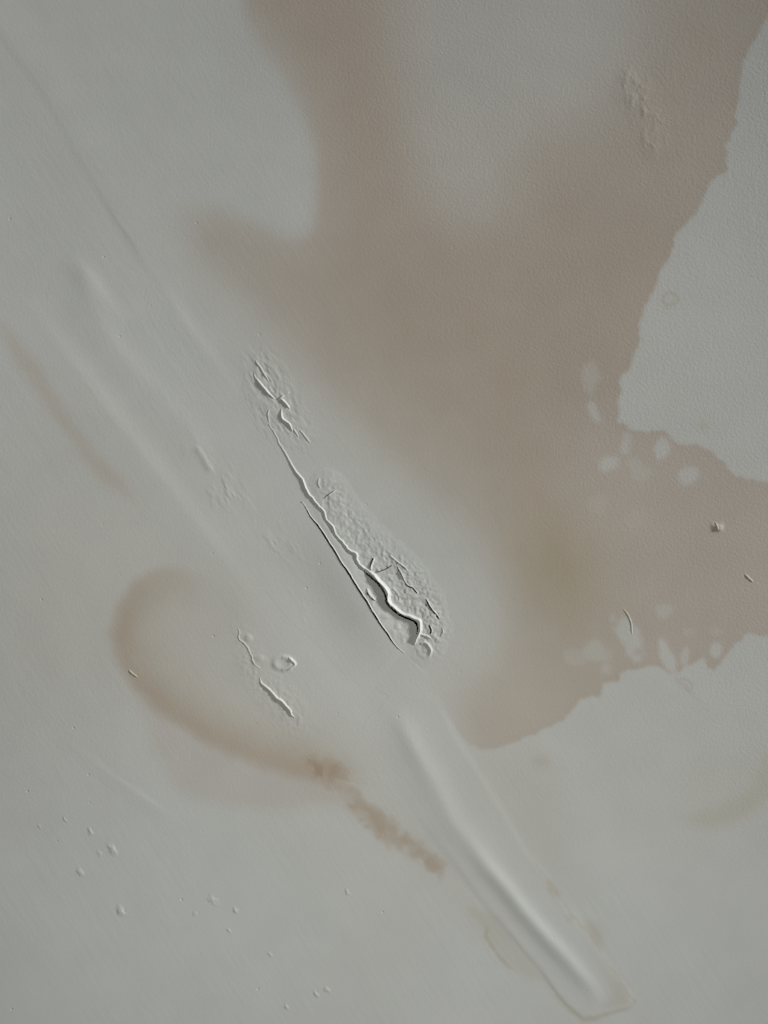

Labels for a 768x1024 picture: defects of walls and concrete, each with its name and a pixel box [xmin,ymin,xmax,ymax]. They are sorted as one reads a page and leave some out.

leakage [94,555,544,987]
leakage [172,0,768,1023]